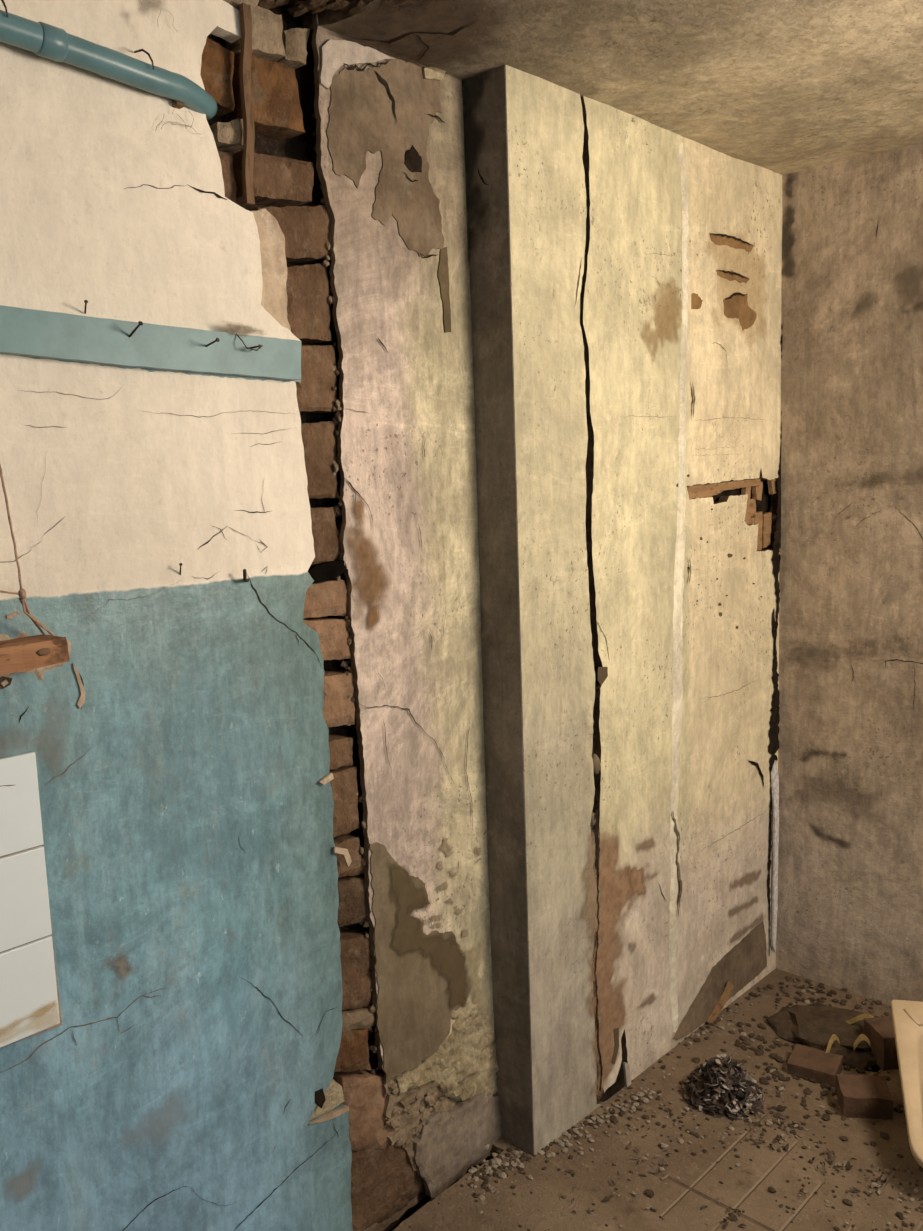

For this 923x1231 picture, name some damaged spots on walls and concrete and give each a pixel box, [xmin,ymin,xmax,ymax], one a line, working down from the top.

spalling [709,233,754,252]
spalling [716,269,757,331]
crack [94,481,322,668]
flaking render [200,4,499,1231]
crack [593,622,610,686]
crack [592,747,601,774]
spalling [637,838,654,851]
crack [590,809,603,1098]
spalling [596,1028,631,1101]
crack [123,1126,338,1231]